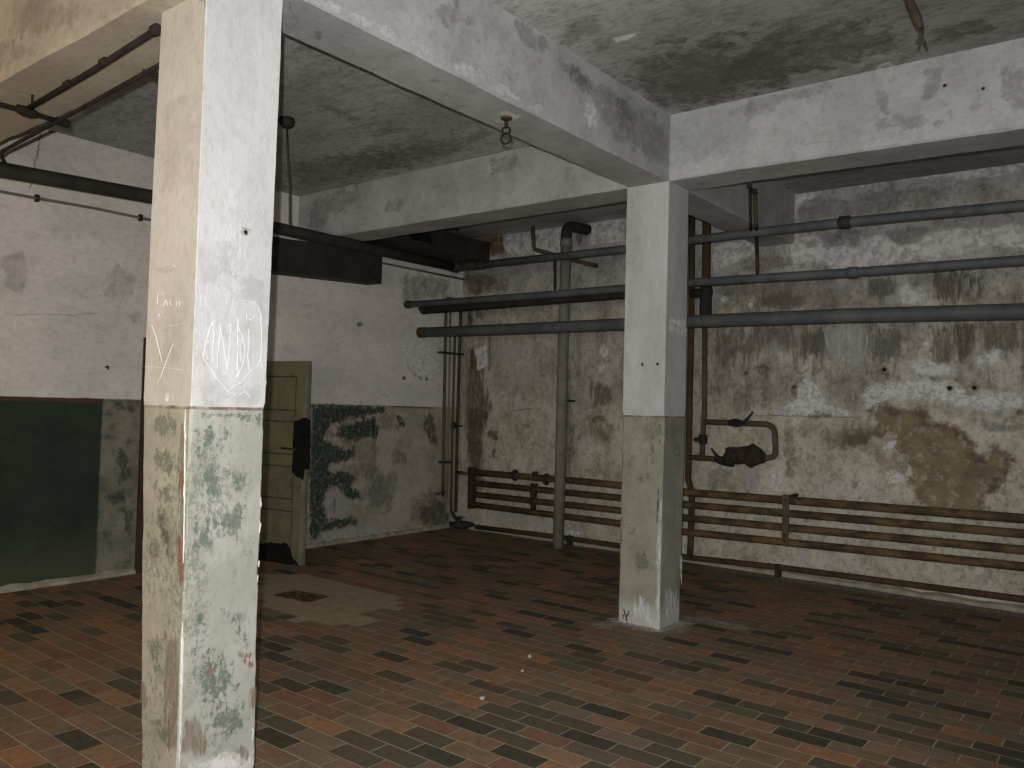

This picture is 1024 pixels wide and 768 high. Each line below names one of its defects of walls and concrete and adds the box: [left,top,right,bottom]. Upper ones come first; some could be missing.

damp [628,19,903,111]
damp [932,323,1018,362]
damp [842,403,1014,510]